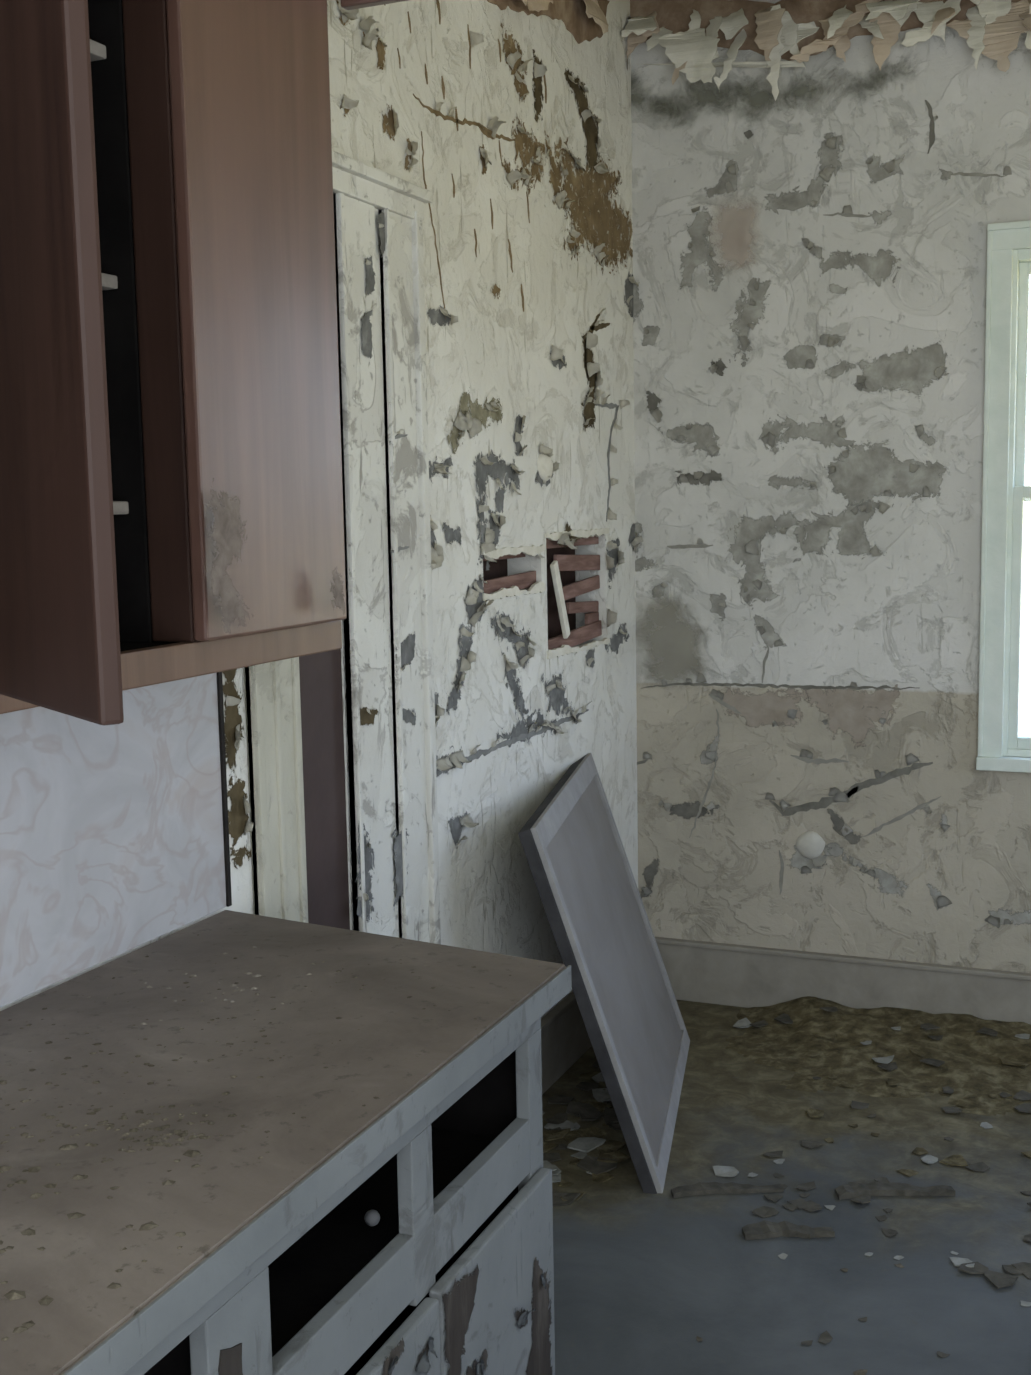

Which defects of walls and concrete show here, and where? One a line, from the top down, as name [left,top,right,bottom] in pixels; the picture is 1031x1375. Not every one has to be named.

peeling [379,104,419,173]
crack [413,93,518,319]
peeling [467,23,660,346]
peeling [361,213,385,359]
peeling [550,335,603,432]
peeling [646,391,722,486]
peeling [783,329,949,398]
flaking render [429,387,655,774]
peeling [658,414,946,838]
peeling [222,669,255,868]
crack [765,749,941,837]
crack [777,850,785,895]